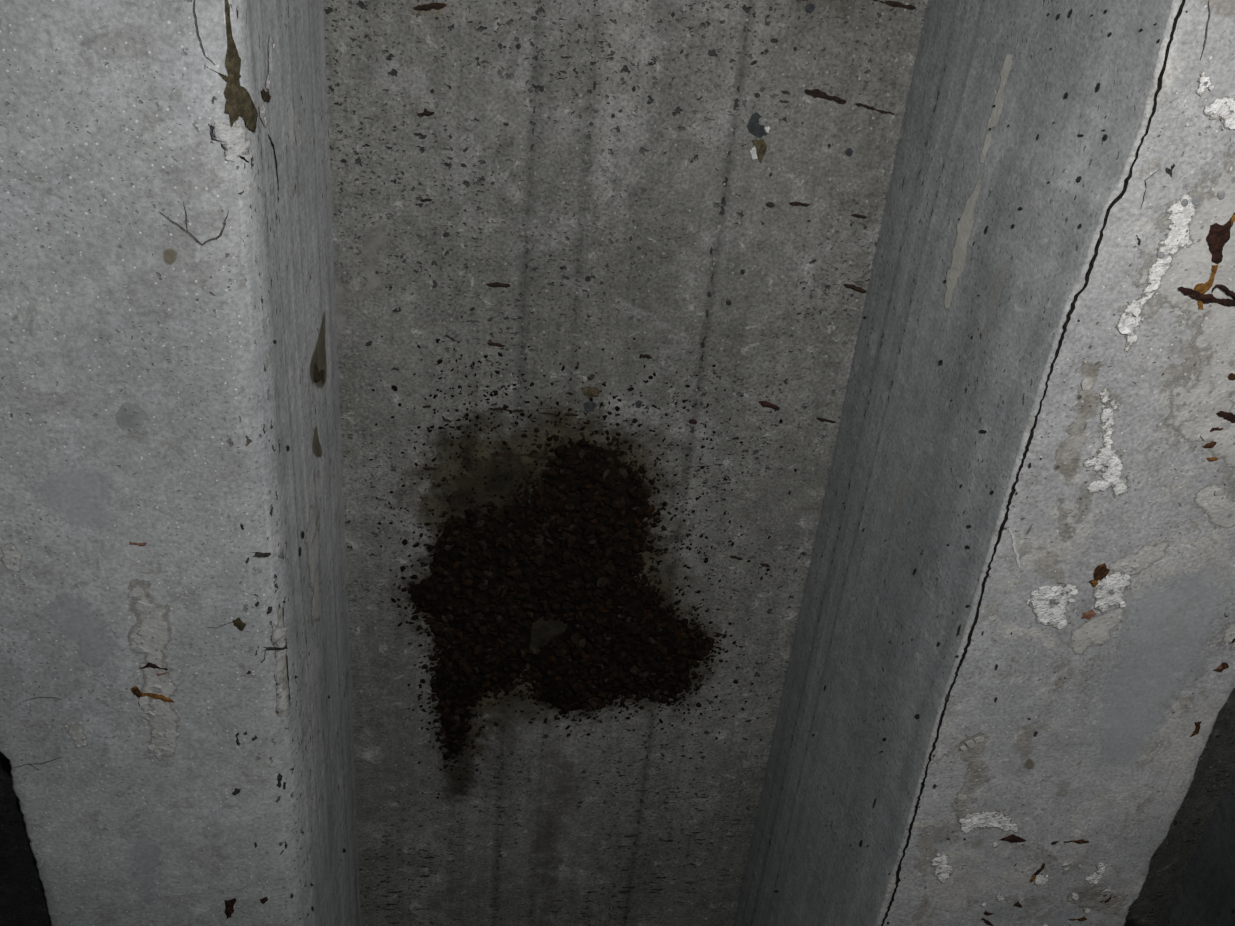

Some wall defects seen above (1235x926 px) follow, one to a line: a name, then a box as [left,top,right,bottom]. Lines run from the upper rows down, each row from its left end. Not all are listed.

spalling [207,0,274,161]
corrosion [1194,213,1235,310]
water stain [406,409,713,674]
crack [881,0,1210,926]
water stain [442,614,661,780]